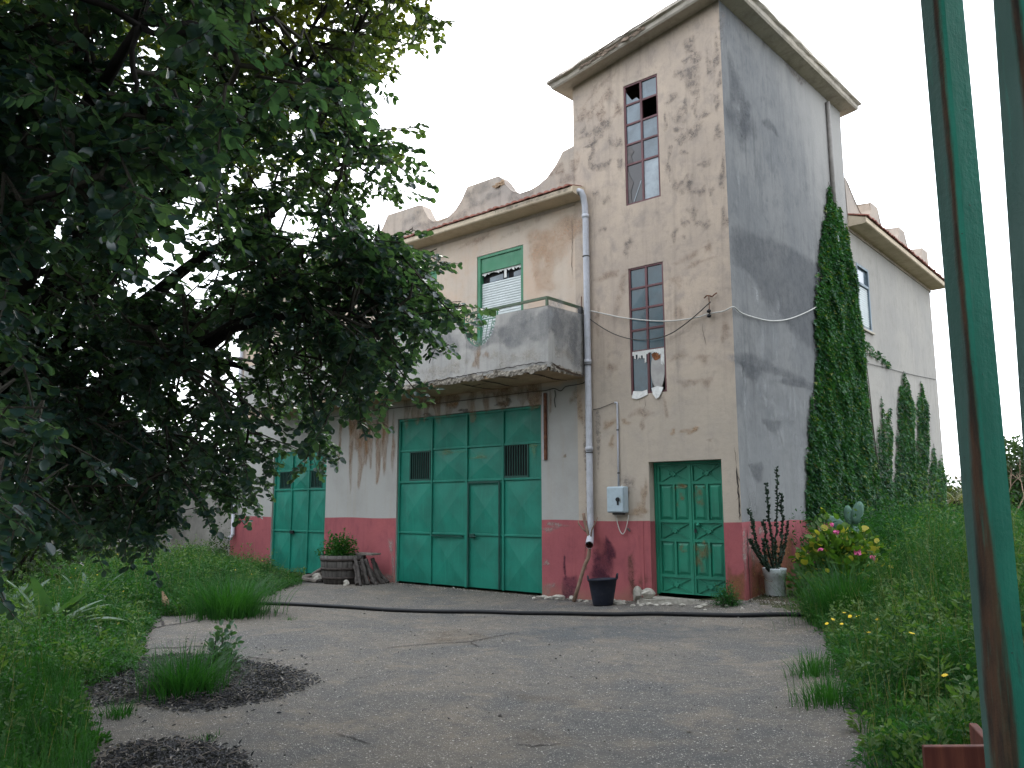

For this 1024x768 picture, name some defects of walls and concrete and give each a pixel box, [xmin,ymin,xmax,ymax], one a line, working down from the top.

spalling [393,354,584,391]